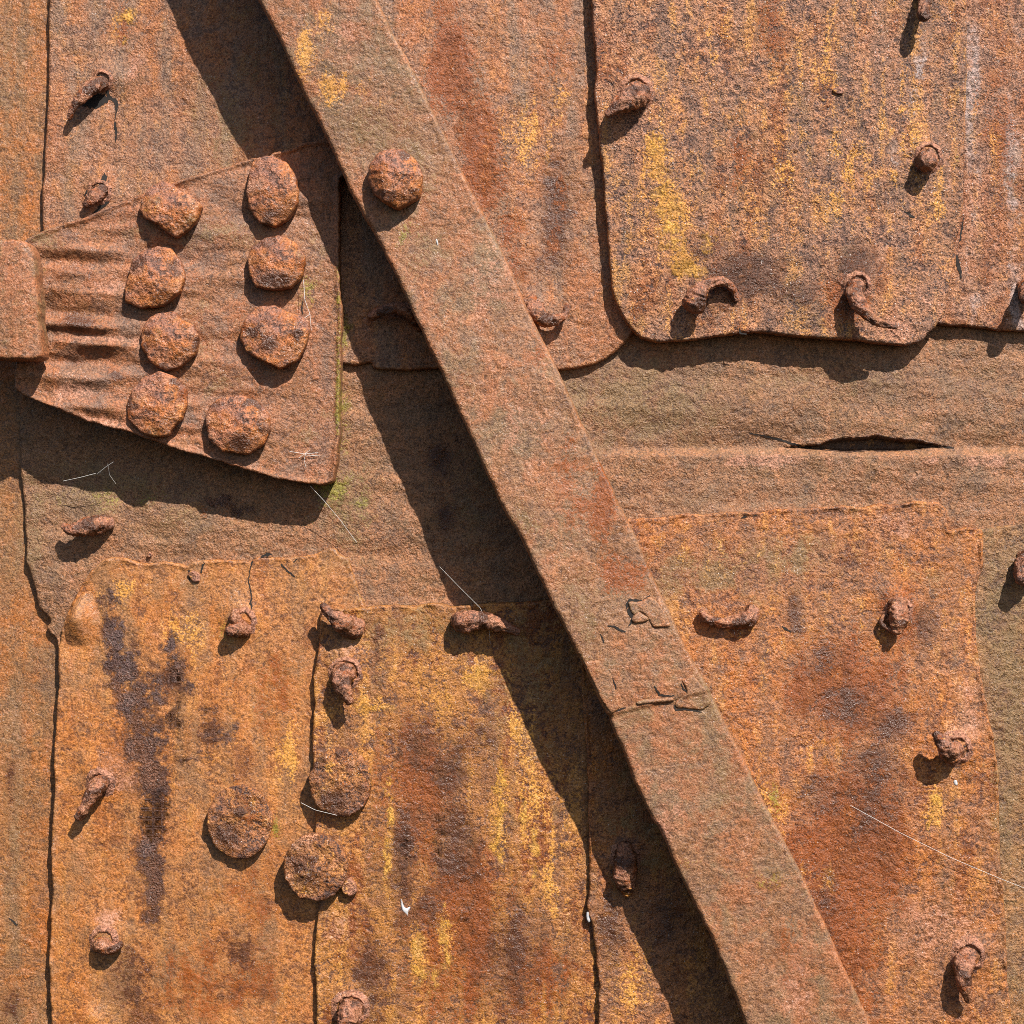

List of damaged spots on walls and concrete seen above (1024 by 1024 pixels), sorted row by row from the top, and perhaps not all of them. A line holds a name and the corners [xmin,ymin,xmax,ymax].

corrosion [910,42,927,114]
corrosion [646,131,790,286]
peeling [628,597,670,628]
peeling [585,660,620,713]
corrosion [97,588,239,927]
corrosion [467,760,540,867]
corrosion [826,759,899,879]
corrosion [342,877,358,896]
corrosion [382,837,549,1002]
corrosion [816,896,869,994]